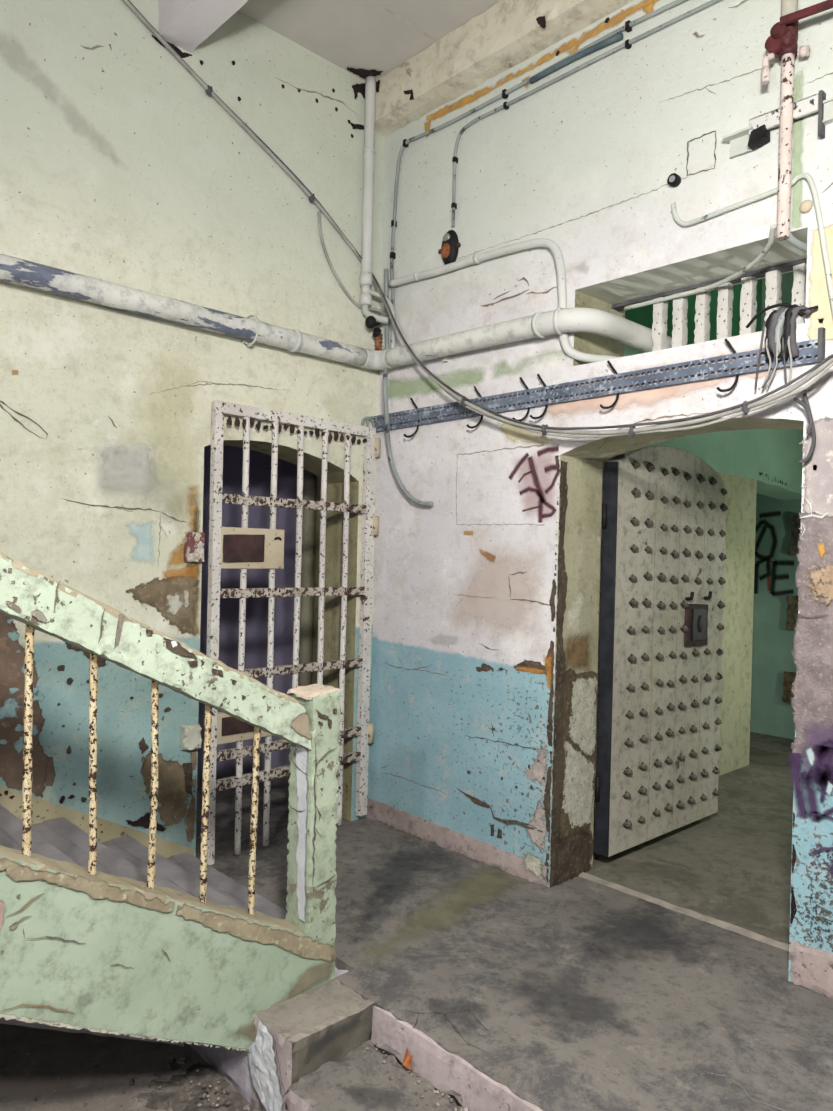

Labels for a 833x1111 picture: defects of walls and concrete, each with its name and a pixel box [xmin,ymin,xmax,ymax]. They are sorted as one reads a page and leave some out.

crack [276,77,354,138]
crack [64,499,187,564]
peeling [0,601,56,799]
peeling [63,641,106,667]
peeling [114,614,125,648]
spalling [125,566,246,699]
peeling [476,455,598,888]
peeling [791,416,833,758]
spalling [126,738,197,843]
crack [382,766,543,838]
peeling [0,858,337,962]
peeling [0,1013,283,1111]